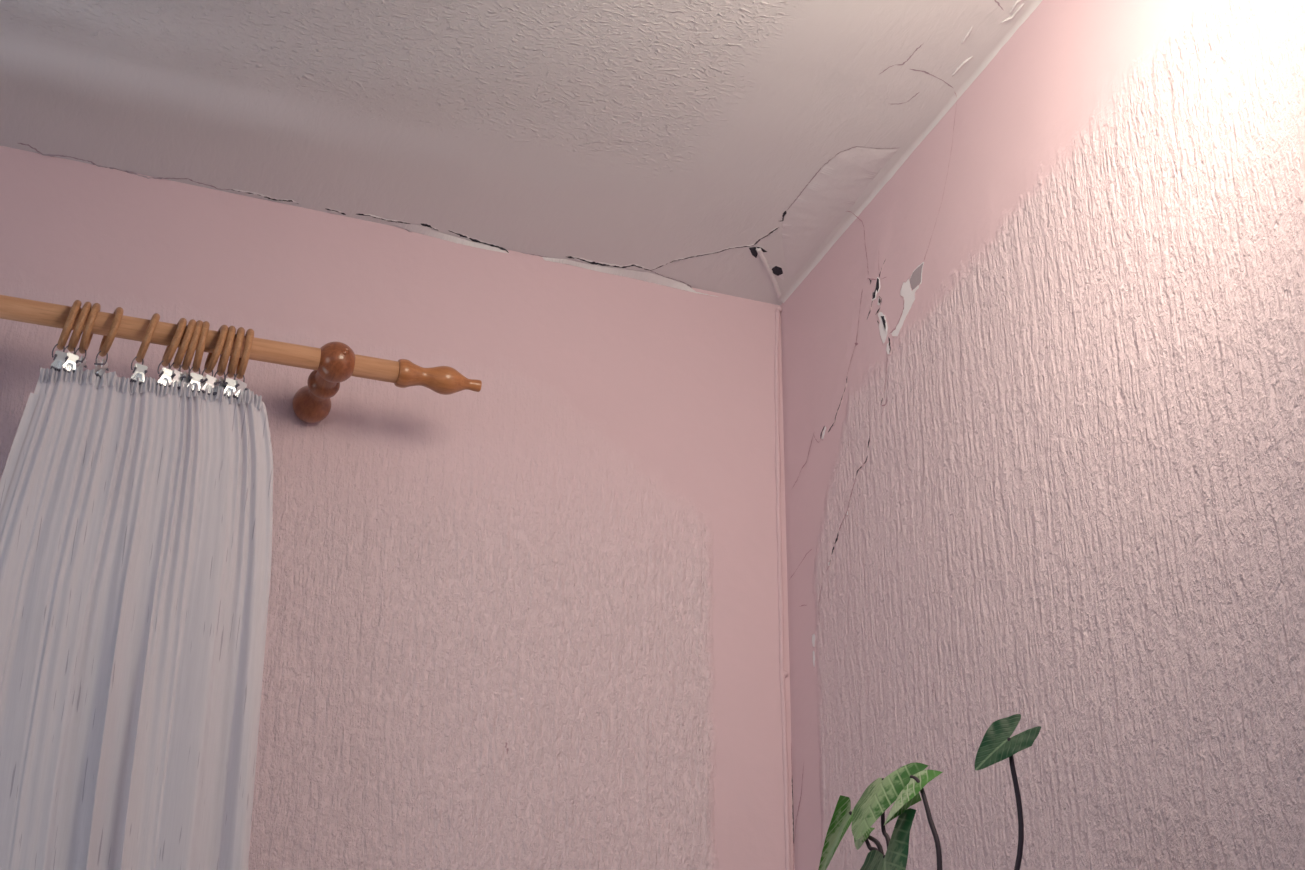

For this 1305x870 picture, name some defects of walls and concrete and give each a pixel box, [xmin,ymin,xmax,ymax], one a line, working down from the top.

crack [0,141,894,297]
crack [791,211,868,490]
flaking render [867,252,927,356]
crack [880,45,957,247]
crack [791,361,887,668]
crack [790,748,804,870]